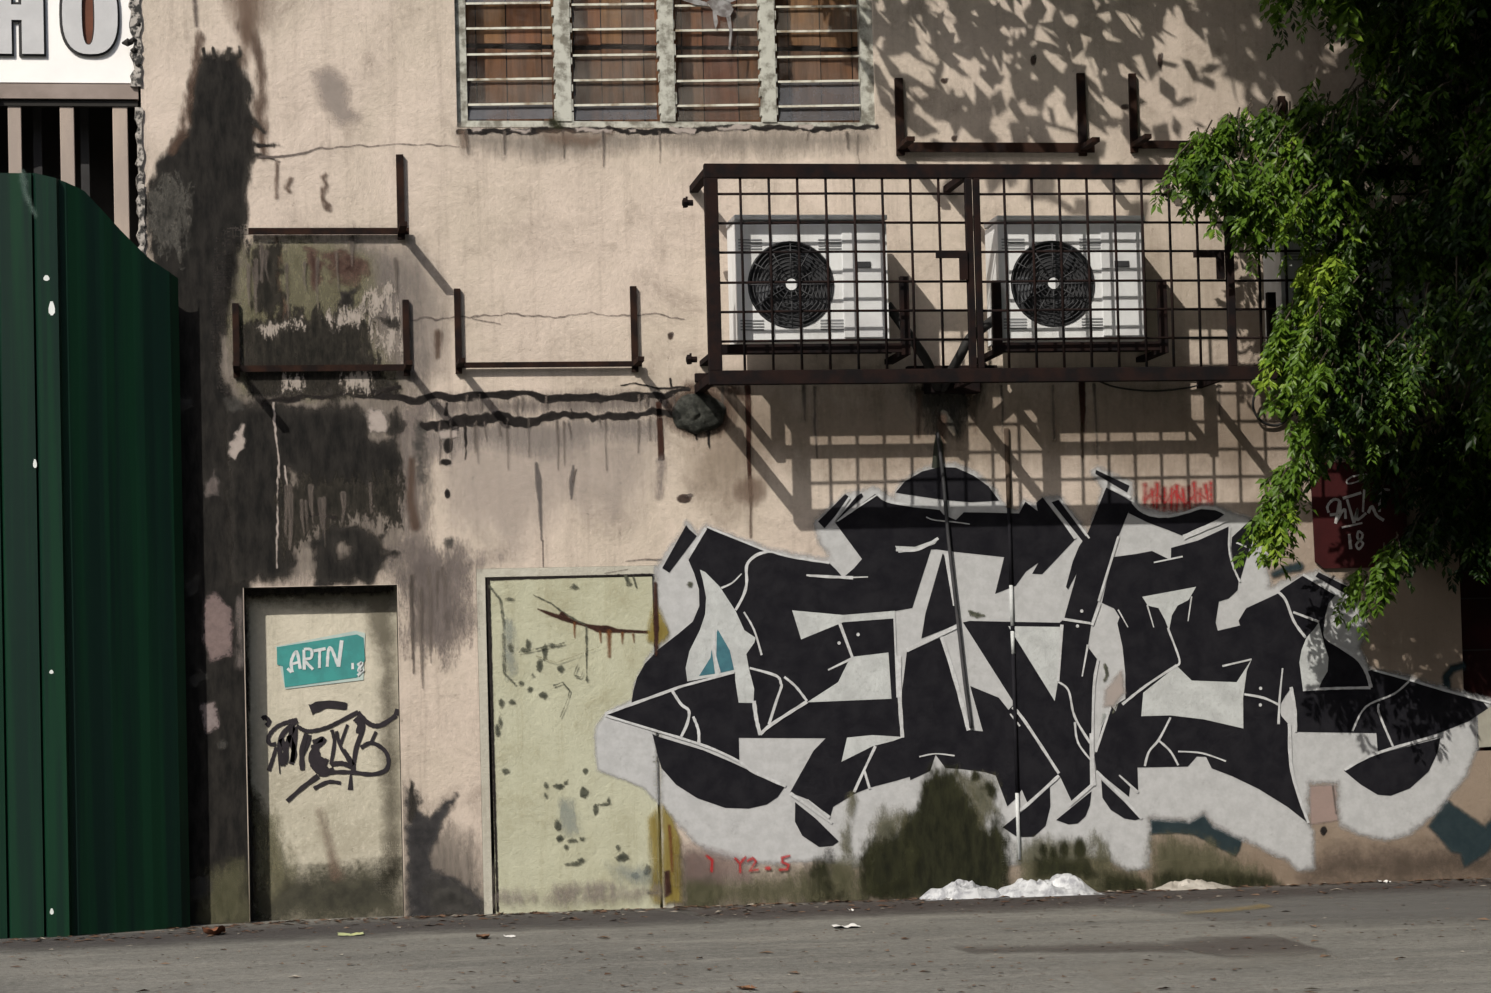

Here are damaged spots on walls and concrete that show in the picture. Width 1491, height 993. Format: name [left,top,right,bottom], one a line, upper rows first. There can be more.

damp [139,0,682,925]
rust [534,582,669,677]